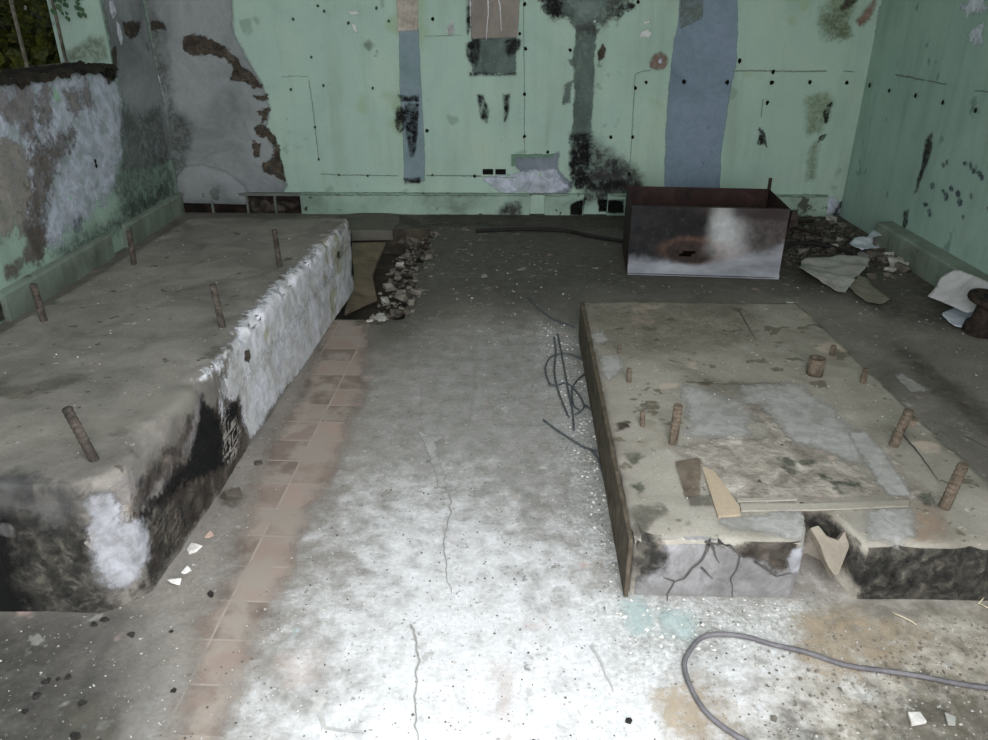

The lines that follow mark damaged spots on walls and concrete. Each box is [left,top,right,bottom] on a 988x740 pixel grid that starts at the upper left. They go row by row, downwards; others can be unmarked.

peeling [0,0,167,266]
spalling [182,33,286,182]
damp [541,0,640,194]
damp [12,493,150,589]
crack [443,486,452,593]
crack [665,537,791,601]
crack [410,624,421,740]